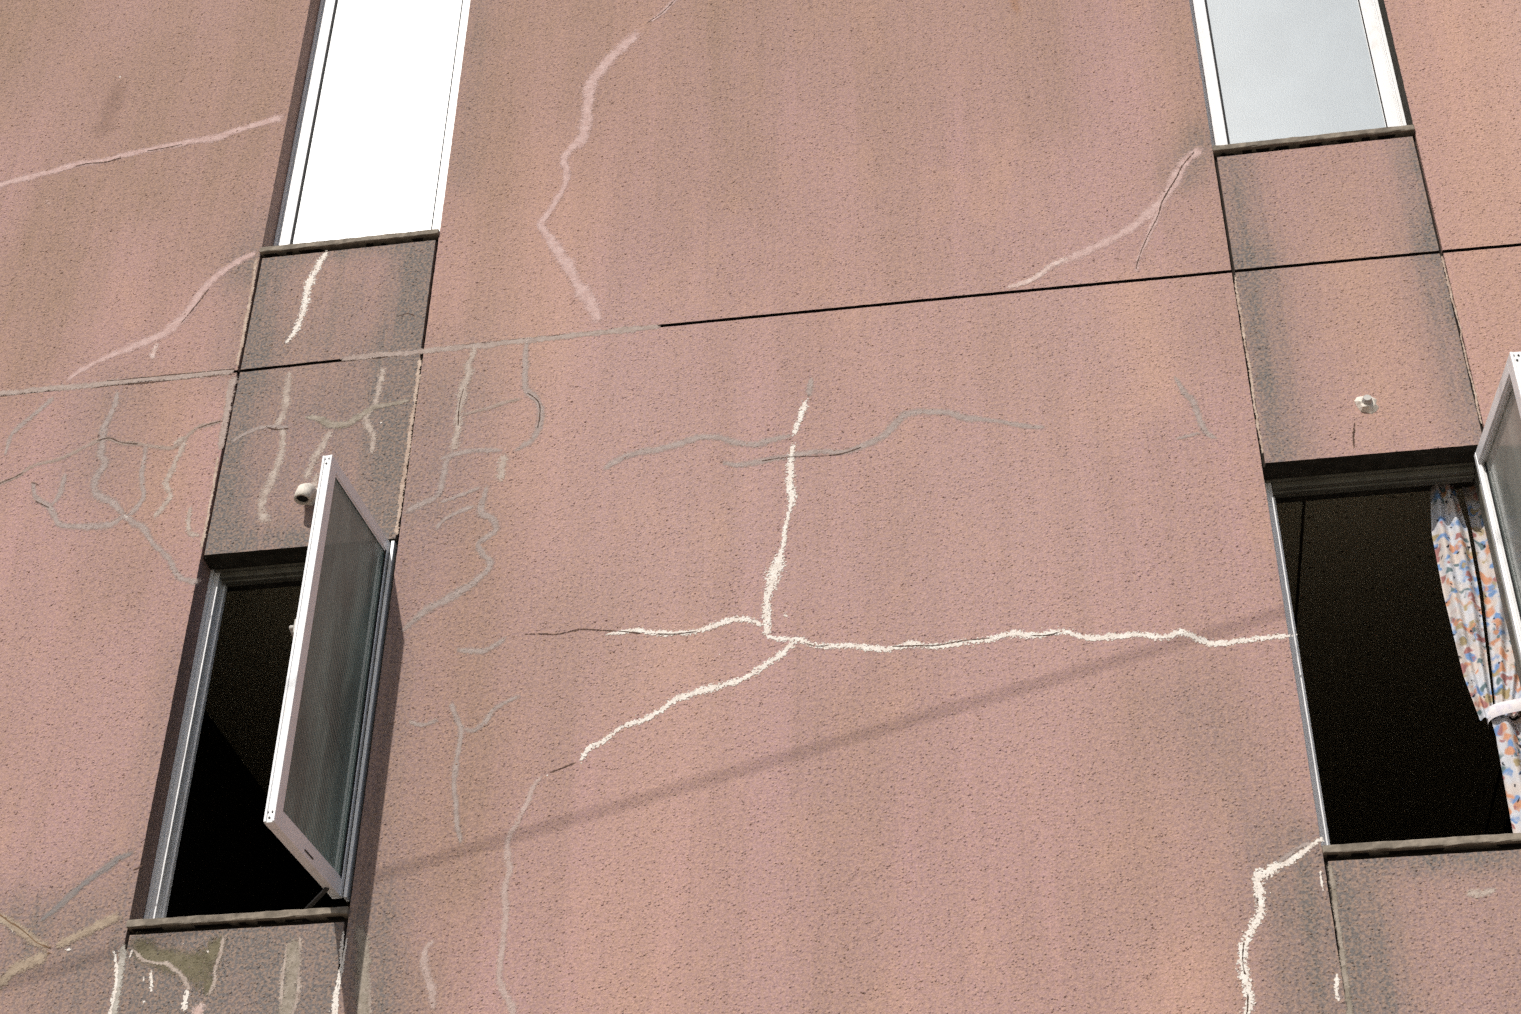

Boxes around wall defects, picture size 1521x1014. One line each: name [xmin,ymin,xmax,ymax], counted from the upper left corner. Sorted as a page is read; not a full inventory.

crack [0,114,284,188]
crack [537,0,676,323]
crack [1006,148,1203,289]
crack [0,250,409,585]
crack [458,377,1297,1014]
crack [410,696,517,842]
crack [276,936,303,1014]
crack [354,927,372,1014]
crack [420,941,437,1009]
crack [1235,837,1324,1014]